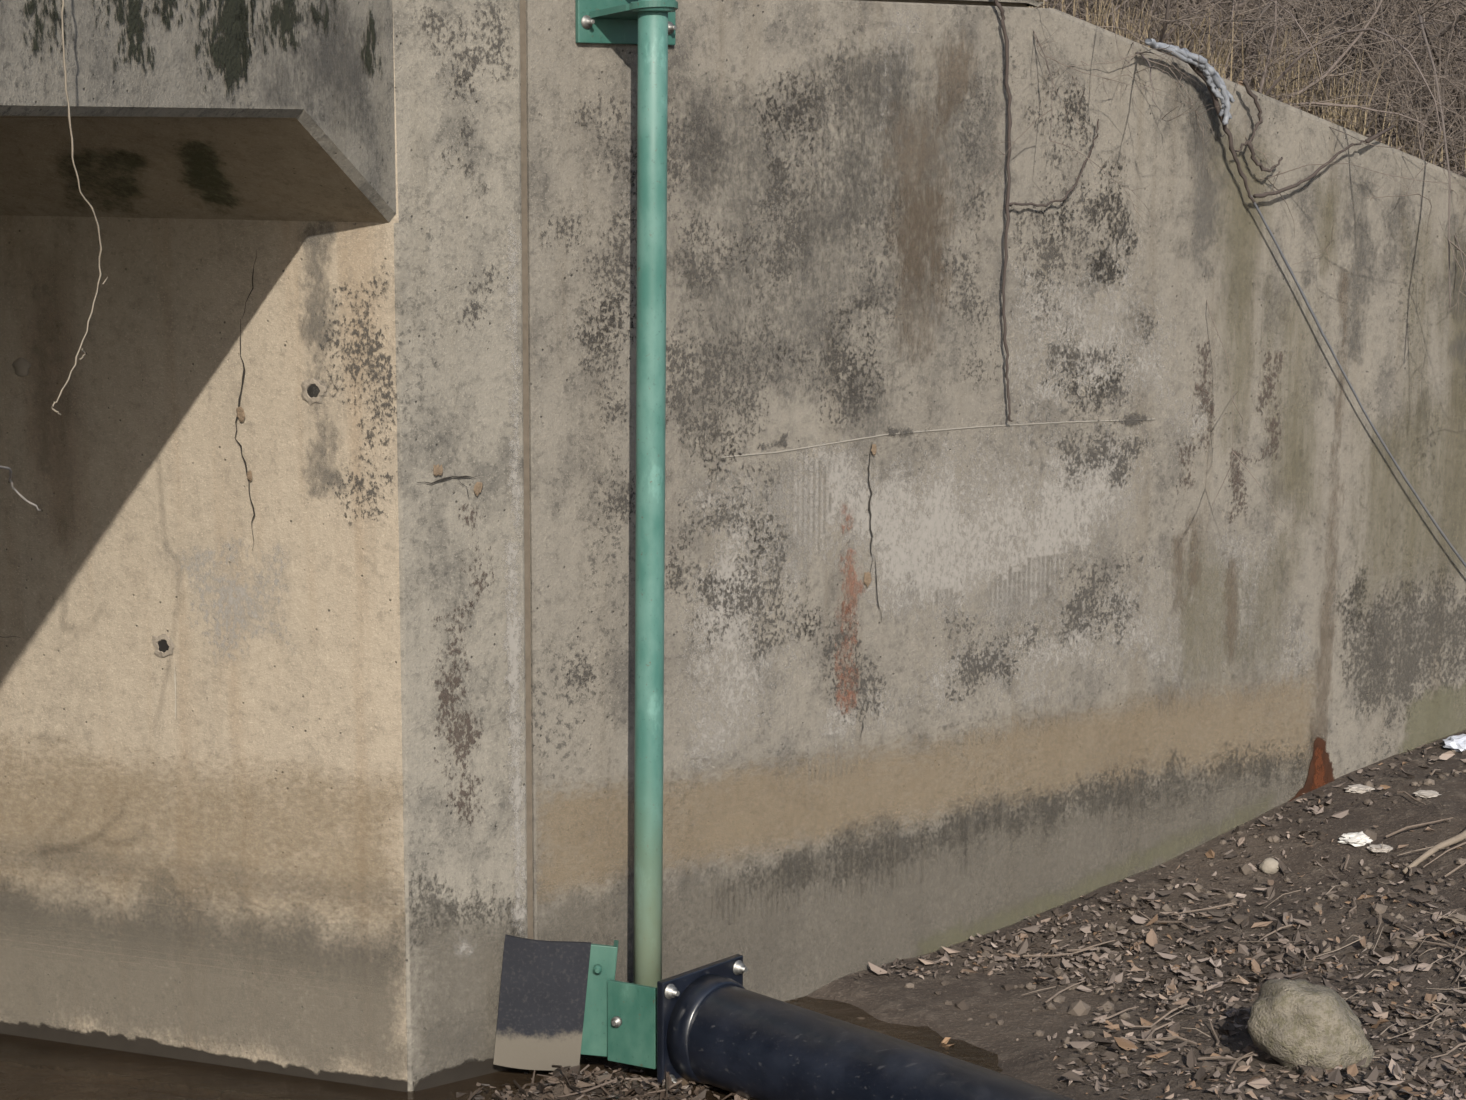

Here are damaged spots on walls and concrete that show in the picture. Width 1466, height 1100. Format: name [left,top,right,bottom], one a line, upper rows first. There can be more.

damp [23,0,71,59]
damp [93,0,187,85]
crack [235,257,257,551]
damp [508,392,521,523]
damp [540,94,637,528]
crack [864,444,882,622]
damp [662,55,1335,1003]
damp [0,543,634,1100]